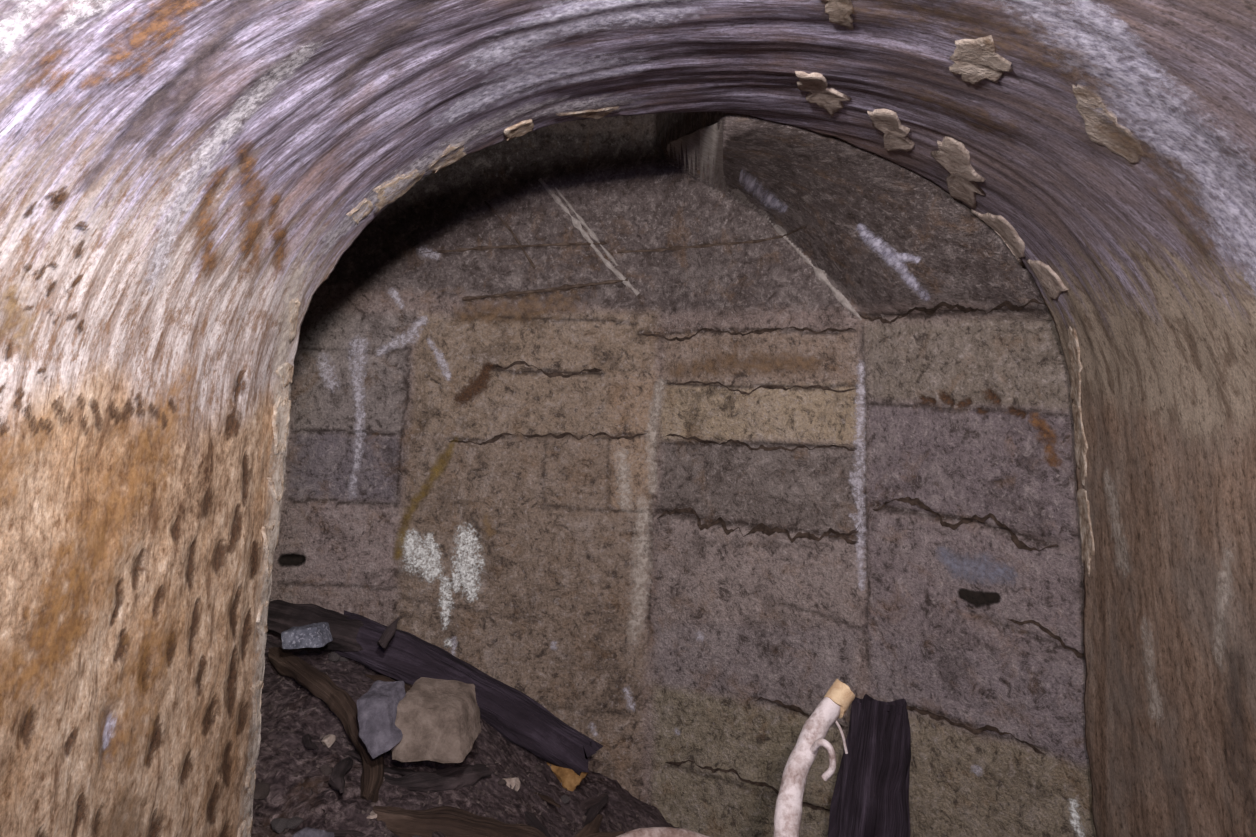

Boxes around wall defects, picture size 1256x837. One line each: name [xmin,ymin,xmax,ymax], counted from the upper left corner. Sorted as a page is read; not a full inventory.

flaking render [825,0,854,30]
corrosion [29,0,200,92]
flaking render [949,35,1013,85]
flaking render [795,71,852,117]
flaking render [867,109,915,153]
corrosion [194,145,287,278]
flaking render [931,136,1068,300]
crack [490,361,602,378]
crack [657,497,1058,551]